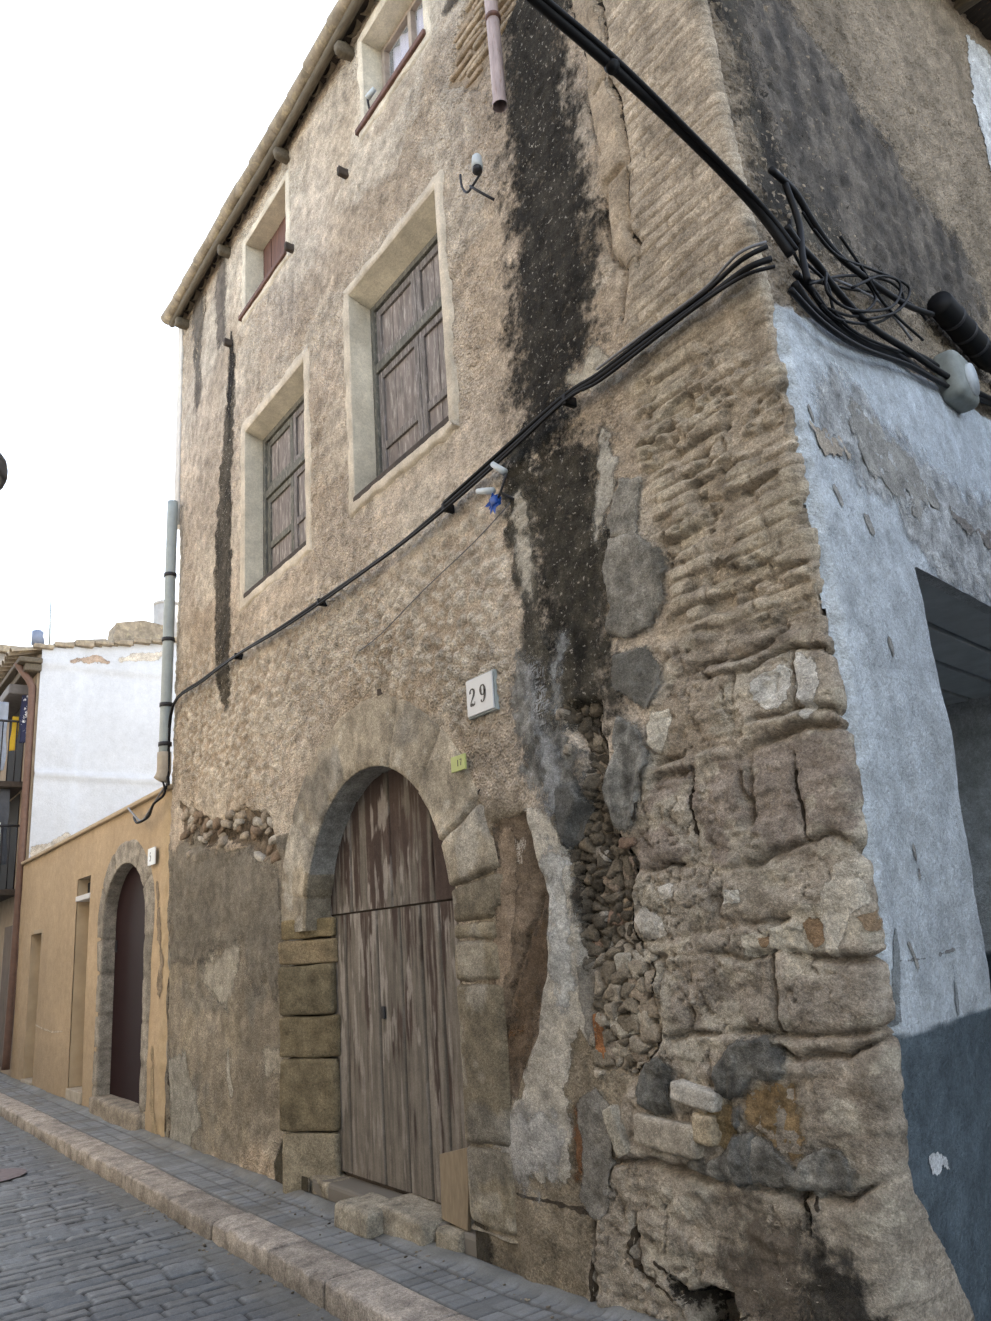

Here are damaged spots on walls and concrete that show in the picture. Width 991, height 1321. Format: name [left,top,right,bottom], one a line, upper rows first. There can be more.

spalling [443,0,516,91]
water stain [191,256,236,711]
peeling [808,365,991,603]
water stain [490,0,623,1202]
spalling [179,800,281,864]
spalling [556,703,662,1079]
crack [688,777,700,835]
crack [794,754,808,837]
spalling [667,1275,740,1321]
water stain [714,1182,881,1321]